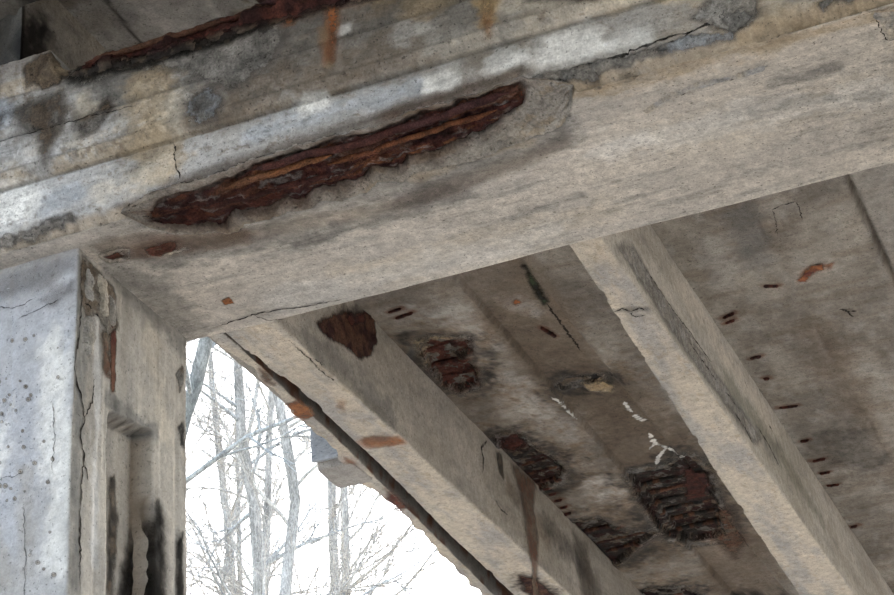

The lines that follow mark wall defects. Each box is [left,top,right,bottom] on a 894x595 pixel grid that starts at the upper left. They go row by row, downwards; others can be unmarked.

peeling [14,0,372,156]
rust [325,6,338,62]
spalling [121,0,768,257]
crack [572,23,712,68]
rust [797,263,833,282]
spalling [317,311,377,360]
crack [21,506,29,595]
crack [74,301,102,578]
leakage [107,475,134,595]
leakage [141,503,166,595]
rust [497,452,539,595]
spalling [489,427,745,567]